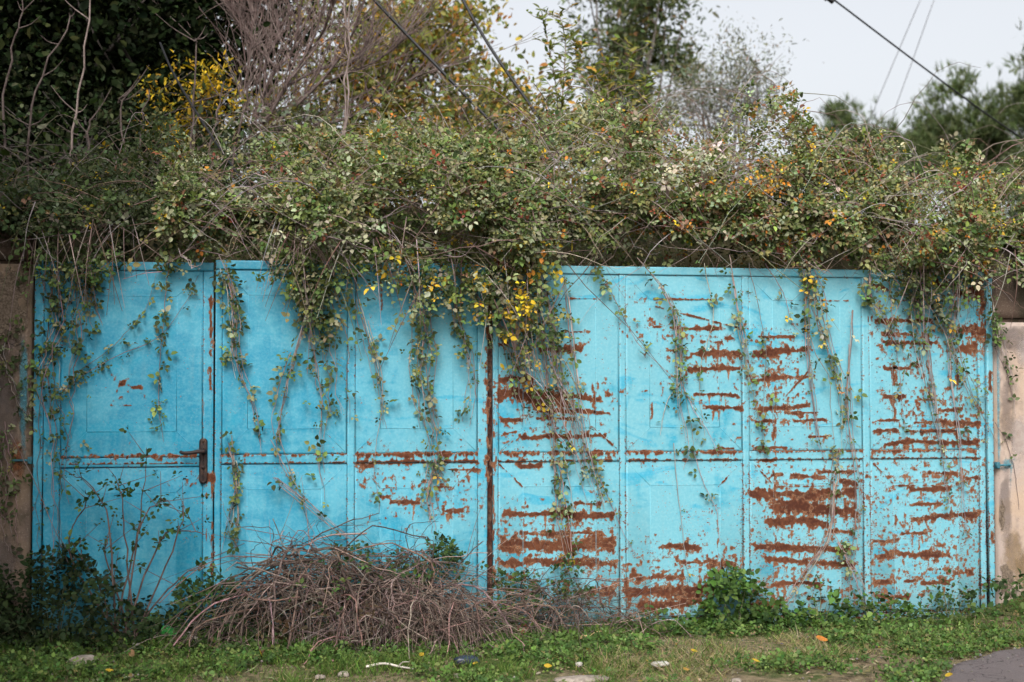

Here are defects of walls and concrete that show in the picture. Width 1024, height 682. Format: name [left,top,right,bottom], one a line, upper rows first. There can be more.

rust [61,266,995,623]